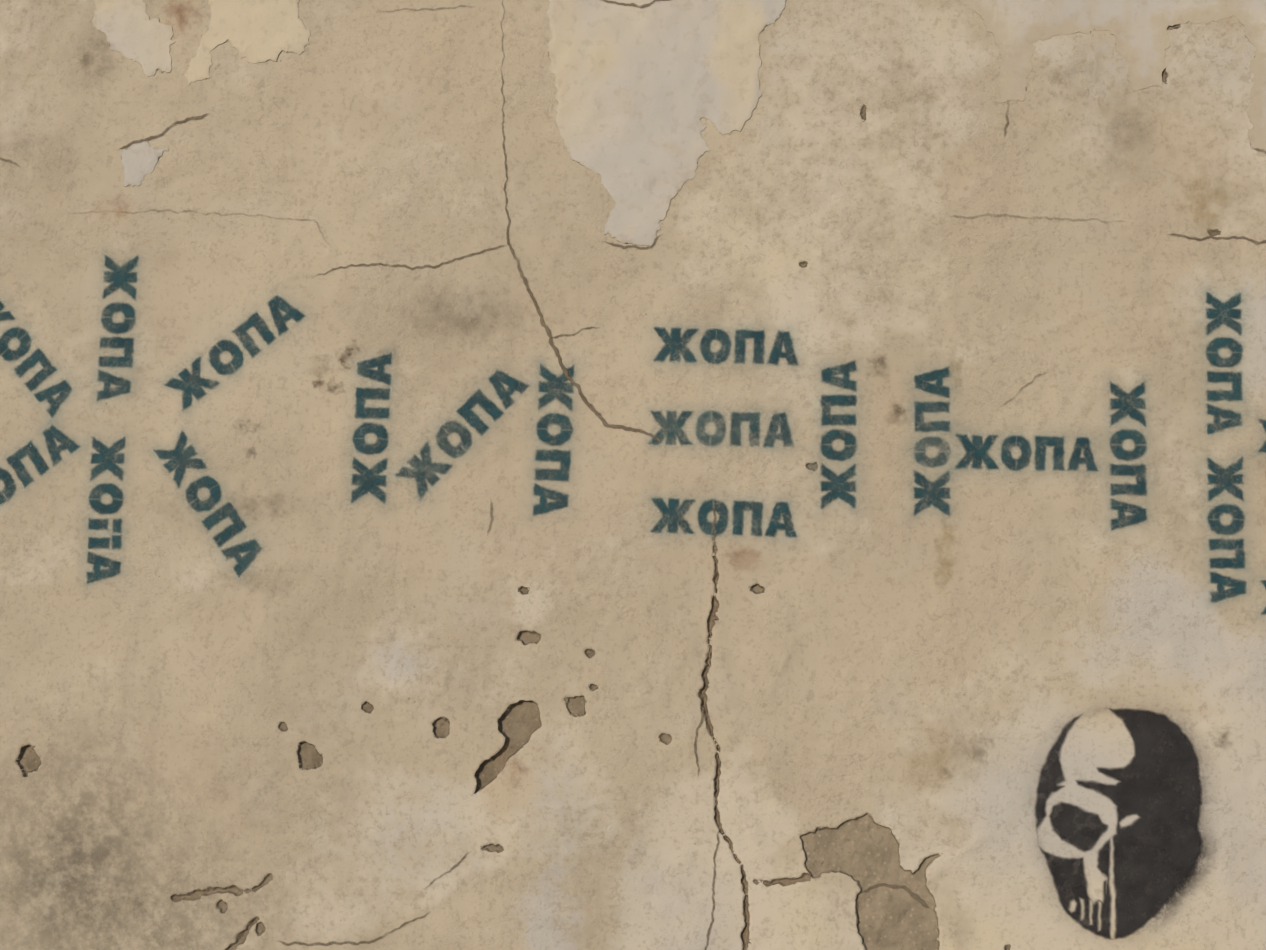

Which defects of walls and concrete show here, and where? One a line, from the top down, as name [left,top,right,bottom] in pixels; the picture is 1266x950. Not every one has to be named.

peeling [92,0,311,84]
peeling [120,141,168,187]
peeling [545,0,786,246]
crack [327,78,661,442]
crack [1171,233,1266,244]
flaking render [471,700,542,796]
crack [694,508,750,950]
crack [170,873,426,950]
flaking render [753,813,943,950]